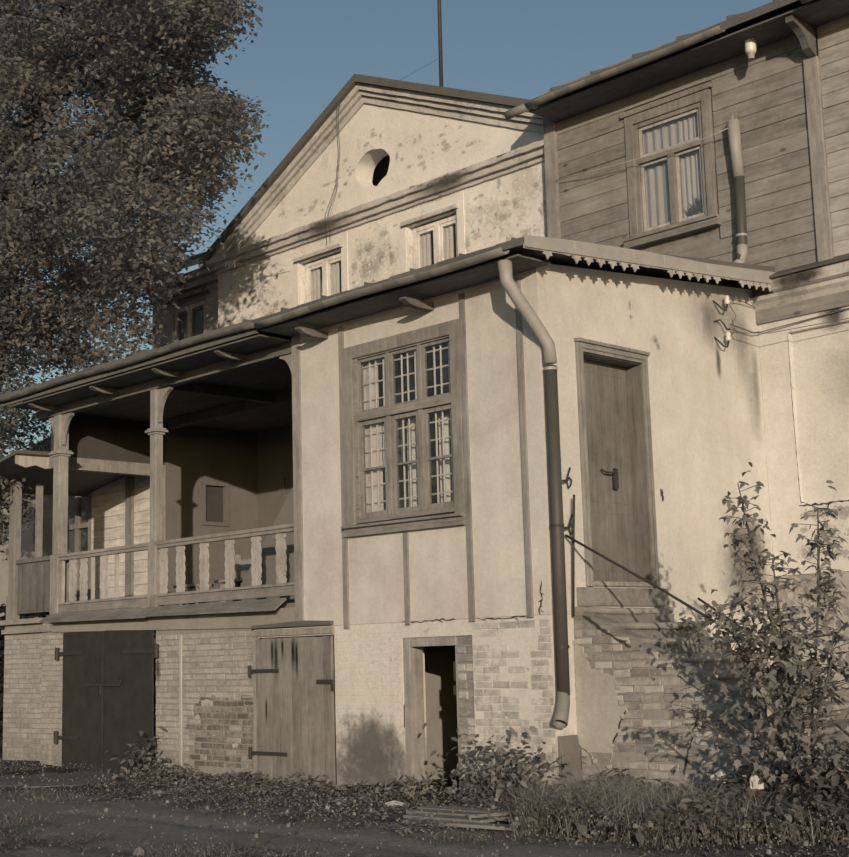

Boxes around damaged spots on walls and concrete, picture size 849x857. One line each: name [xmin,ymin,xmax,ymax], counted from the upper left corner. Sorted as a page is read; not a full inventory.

crack [479,581,544,620]
leakage [271,641,298,671]
flaking render [184,695,254,769]
leakage [348,723,391,788]
crack [683,706,699,776]
flaking render [572,613,843,802]